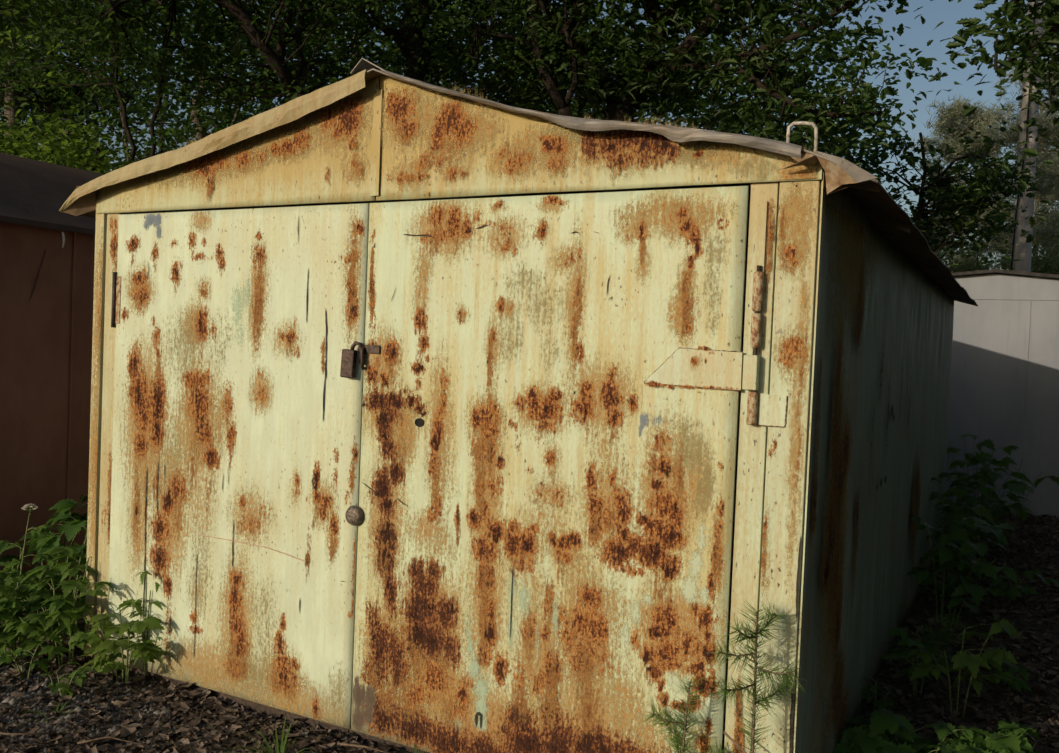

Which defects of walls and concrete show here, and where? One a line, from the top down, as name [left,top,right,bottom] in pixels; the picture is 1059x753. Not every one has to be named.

corrosion [88,86,755,753]
corrosion [760,514,770,587]
corrosion [764,157,823,552]